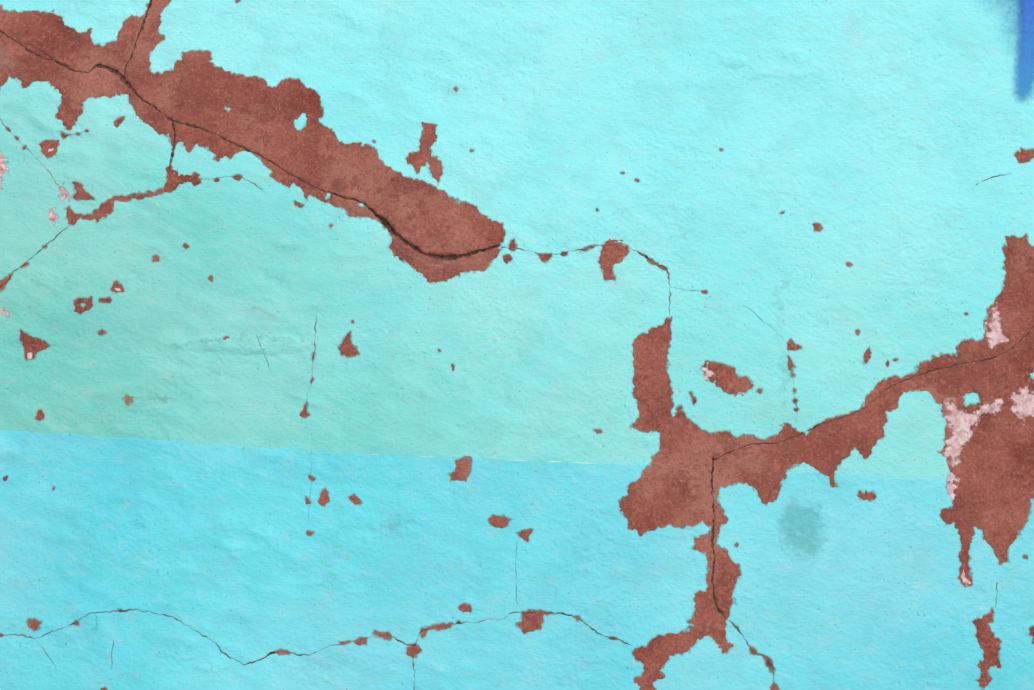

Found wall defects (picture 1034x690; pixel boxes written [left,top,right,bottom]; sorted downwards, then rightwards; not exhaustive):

peeling [0,0,505,283]
crack [0,0,700,319]
peeling [1014,148,1034,163]
peeling [598,239,629,281]
peeling [20,330,49,360]
crack [300,310,317,418]
peeling [620,235,1034,690]
crack [710,304,1033,690]
crack [0,547,635,690]